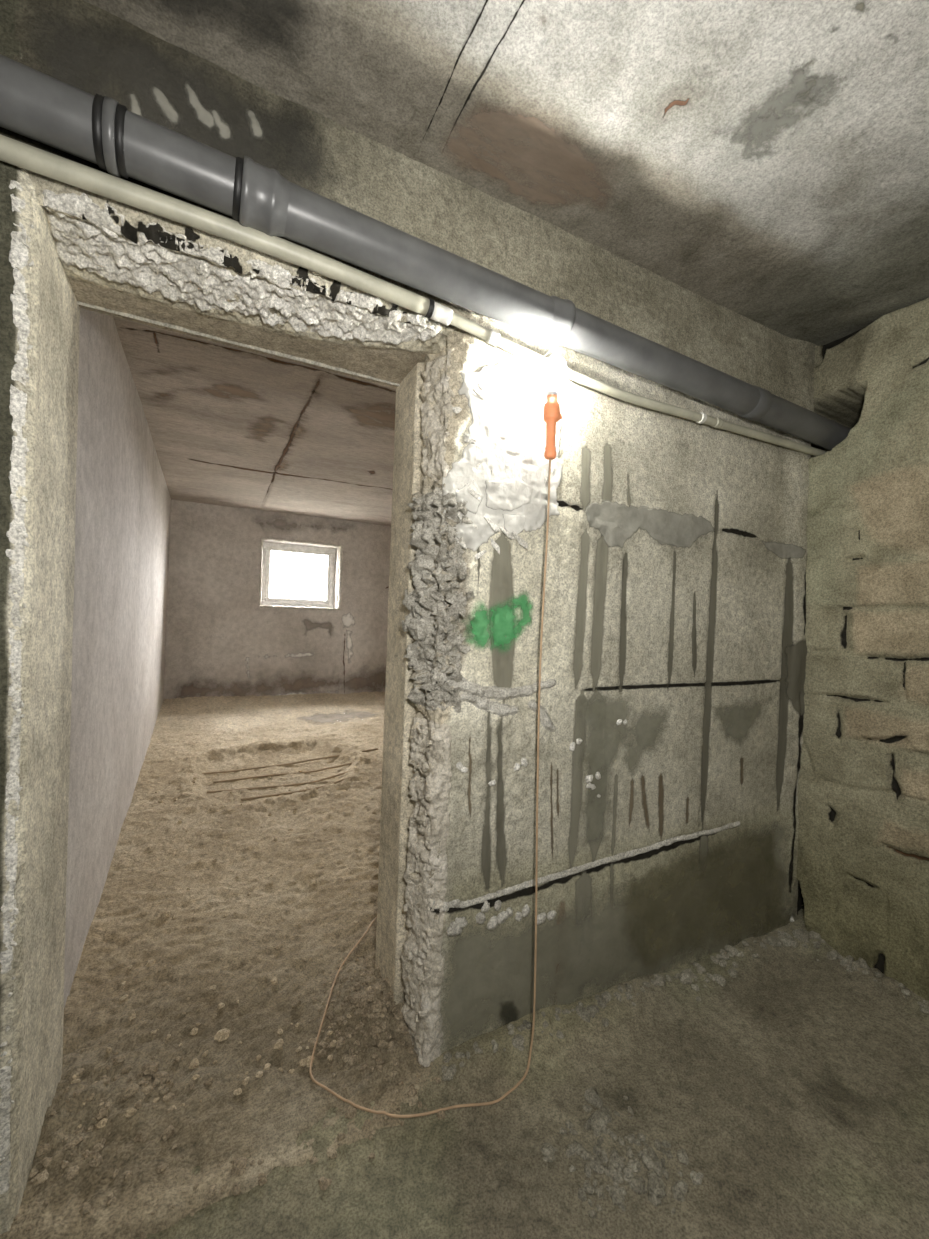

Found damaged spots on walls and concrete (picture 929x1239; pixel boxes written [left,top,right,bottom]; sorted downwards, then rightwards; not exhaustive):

crack [423,0,525,150]
rust [663,98,689,118]
leakage [732,61,836,159]
crack [121,327,396,493]
spalling [0,180,34,997]
spalling [41,189,563,1067]
crack [430,832,718,914]
leakage [443,444,786,1040]
leakage [762,541,807,811]
crack [789,714,804,893]
crack [800,572,808,634]
spalling [0,1026,14,1195]